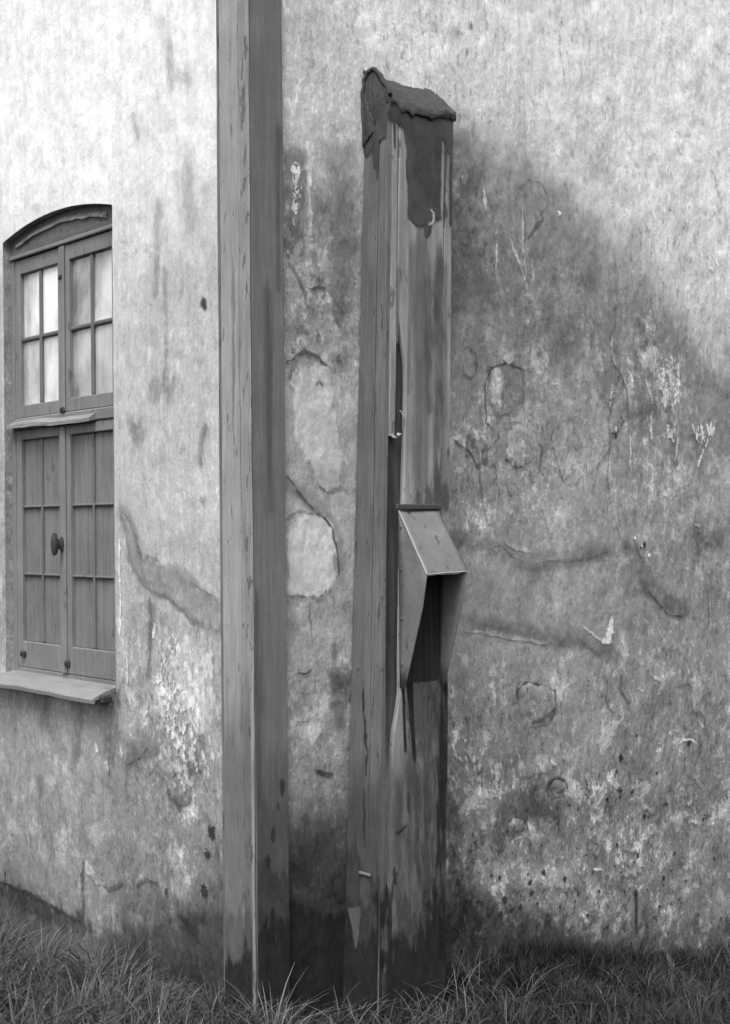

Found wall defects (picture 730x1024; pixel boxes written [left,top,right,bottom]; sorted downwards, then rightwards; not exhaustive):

peeling [286,142,313,258]
crack [286,340,327,379]
crack [452,417,511,526]
crack [533,304,688,617]
peeling [631,355,715,467]
crack [120,506,221,631]
crack [285,476,347,639]
spalling [583,618,614,644]
water stain [96,680,730,1024]